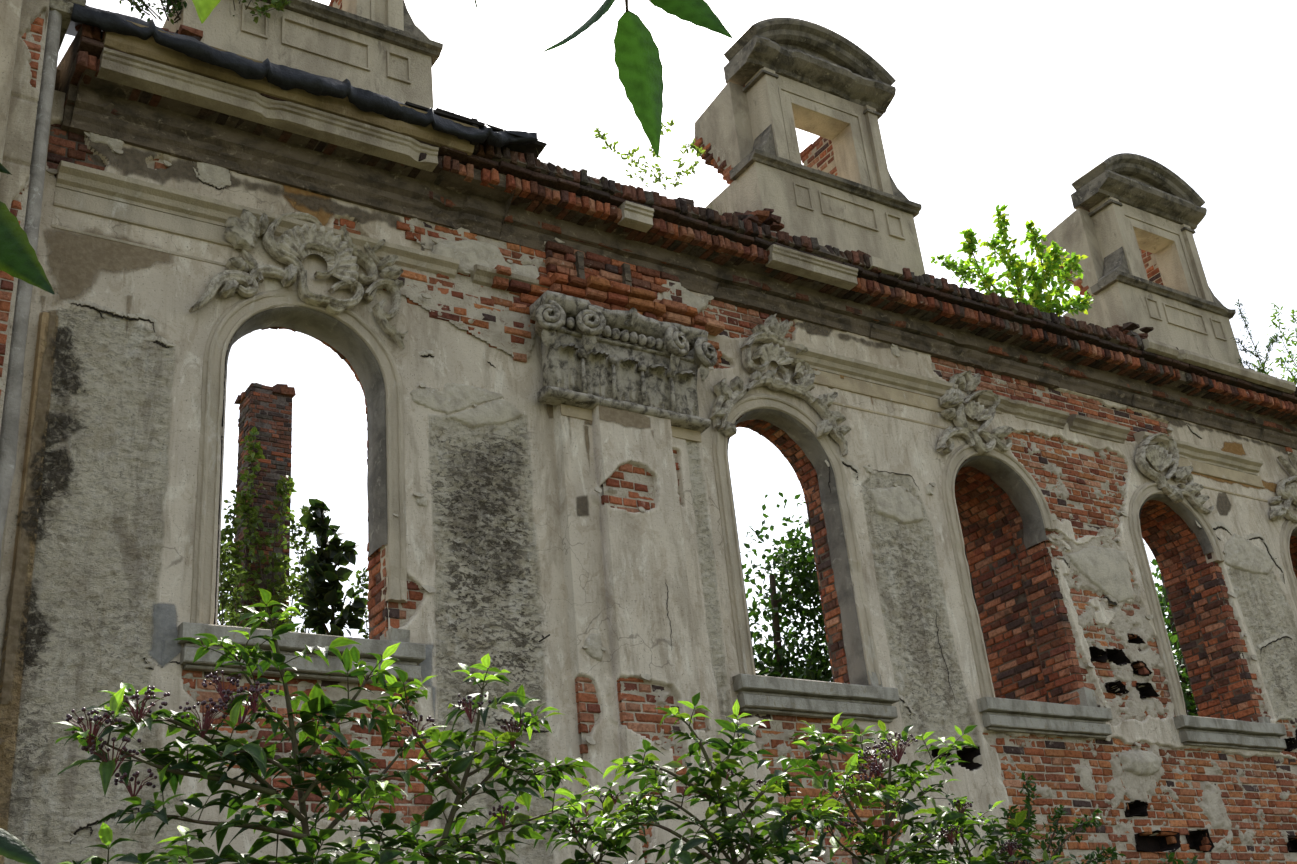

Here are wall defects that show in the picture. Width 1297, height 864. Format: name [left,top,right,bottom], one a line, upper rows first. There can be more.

flaking render [0,270,18,431]
flaking render [383,217,565,363]
leakage [0,230,171,704]
flaking render [594,464,655,513]
leakage [150,603,181,666]
flaking render [930,357,1297,864]
flaking render [575,677,601,817]
flaking render [617,674,712,863]